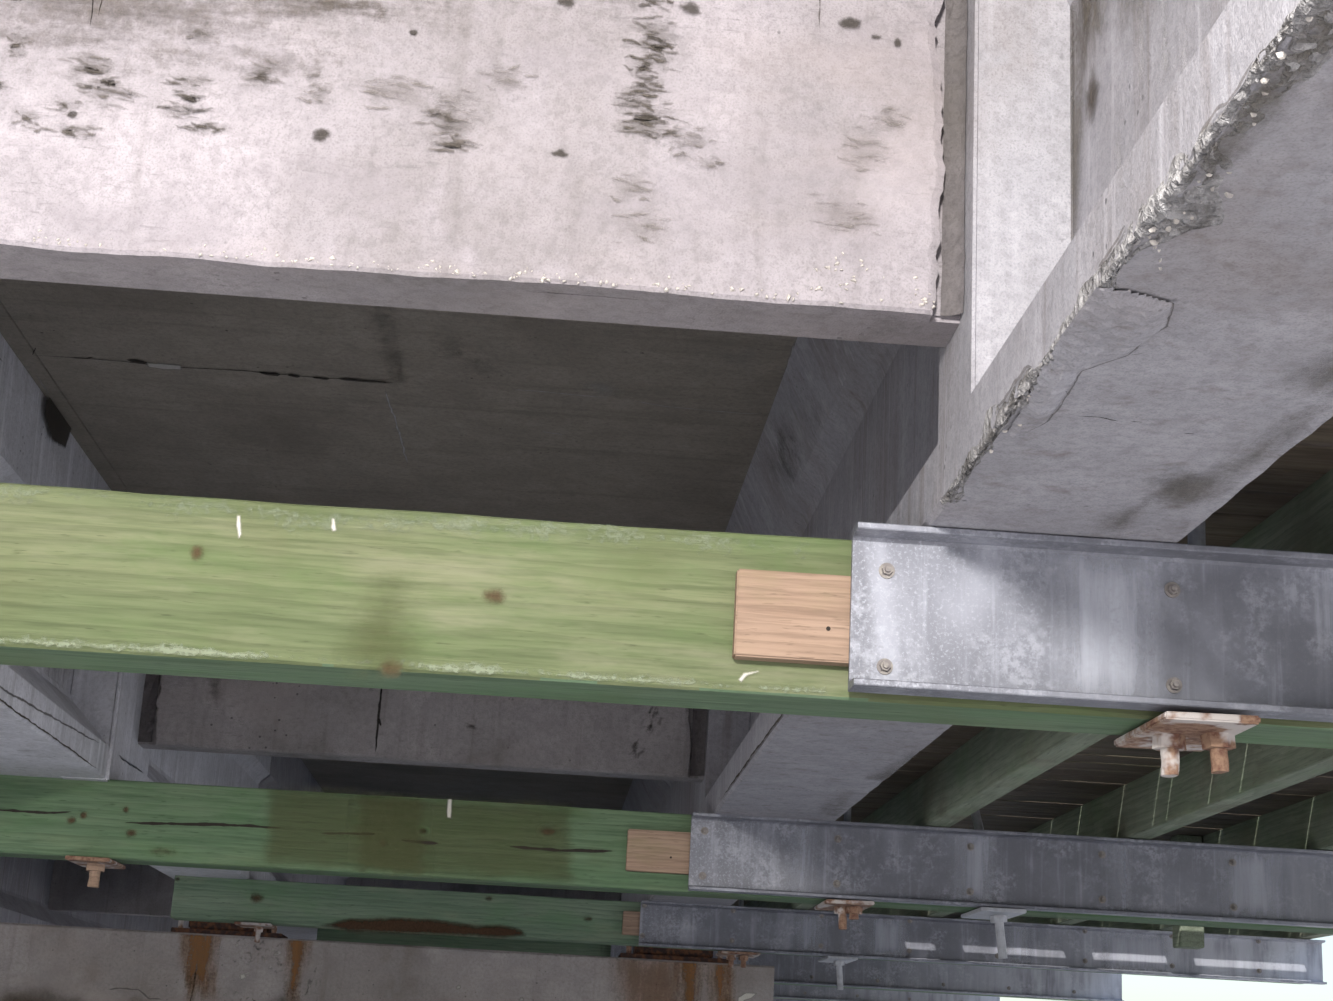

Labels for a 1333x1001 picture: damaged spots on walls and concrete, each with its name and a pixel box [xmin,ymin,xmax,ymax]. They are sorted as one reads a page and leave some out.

spalling [940,0,1333,505]
crack [32,348,148,365]
crack [181,367,391,383]
crack [374,689,382,751]
corrosion [181,934,215,994]
corrosion [288,940,306,992]
corrosion [682,963,731,1001]